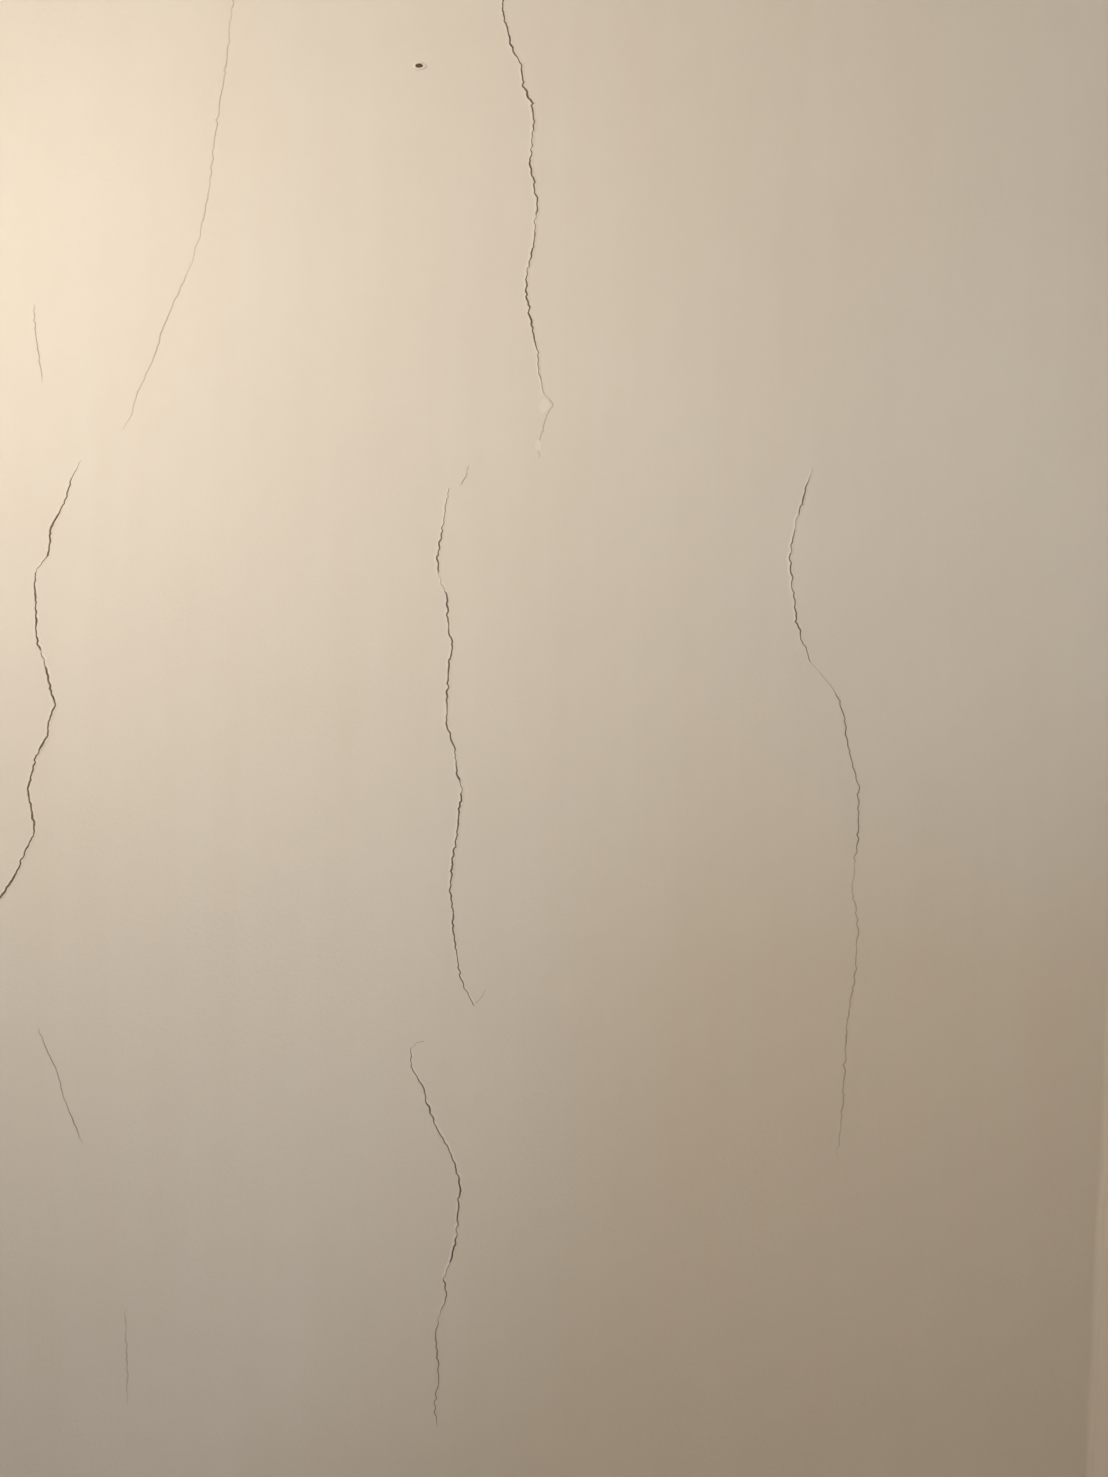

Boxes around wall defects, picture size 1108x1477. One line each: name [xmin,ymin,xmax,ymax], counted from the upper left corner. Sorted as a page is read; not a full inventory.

crack [33,305,43,382]
crack [500,0,554,458]
crack [0,460,82,901]
crack [434,465,486,1006]
crack [786,467,860,1158]
crack [409,1041,464,1425]